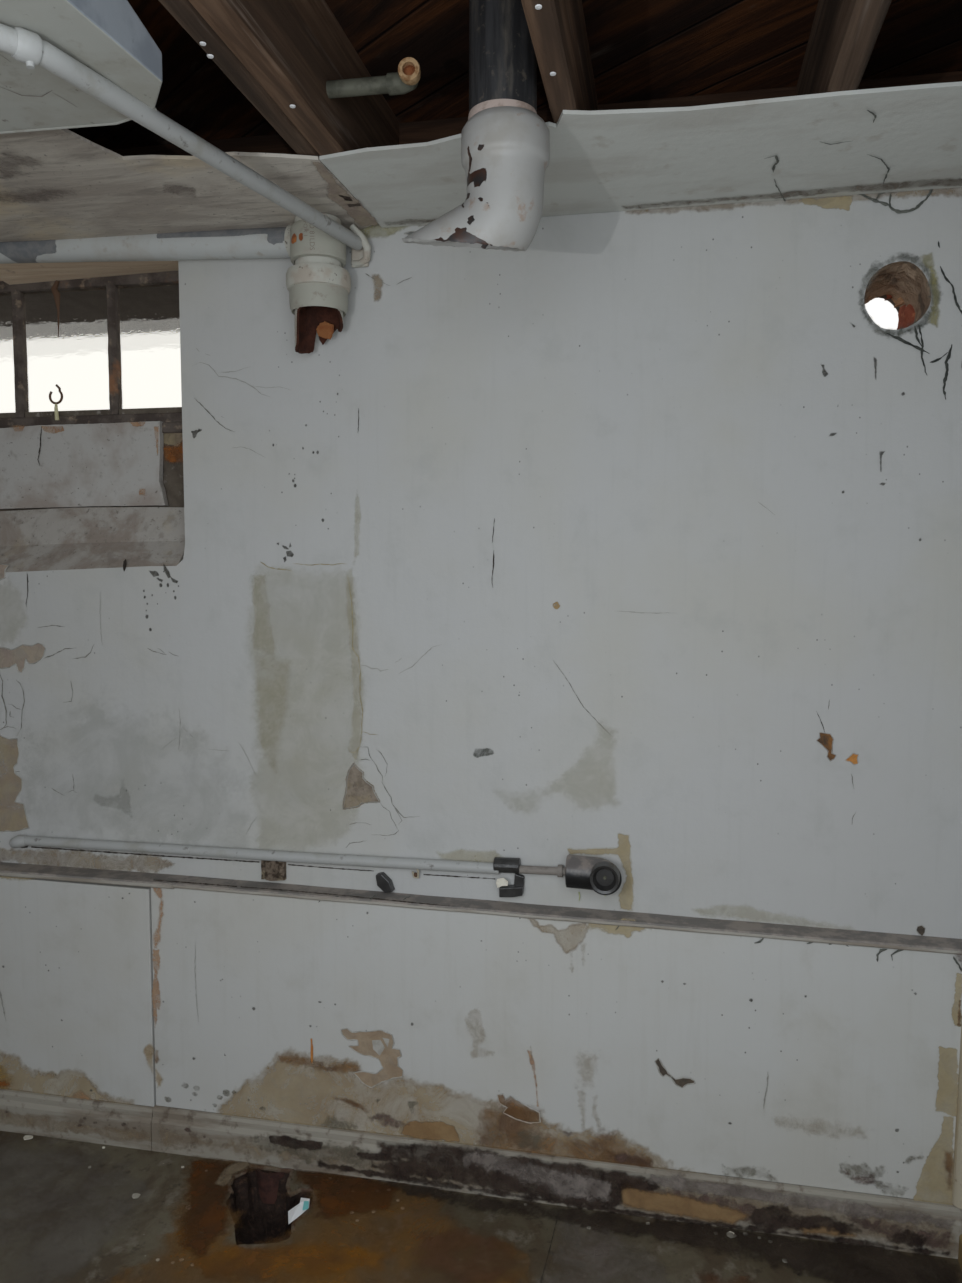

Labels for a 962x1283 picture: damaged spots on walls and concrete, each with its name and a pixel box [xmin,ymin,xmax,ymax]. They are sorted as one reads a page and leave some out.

rust [316,321,334,340]
peeling [0,643,46,673]
crack [261,562,439,845]
peeling [0,735,29,832]
spalling [343,763,380,810]
damp [952,973,962,1027]
damp [0,1054,114,1102]
peeling [341,1029,403,1088]
peeling [497,1094,541,1124]
damp [217,1046,959,1283]